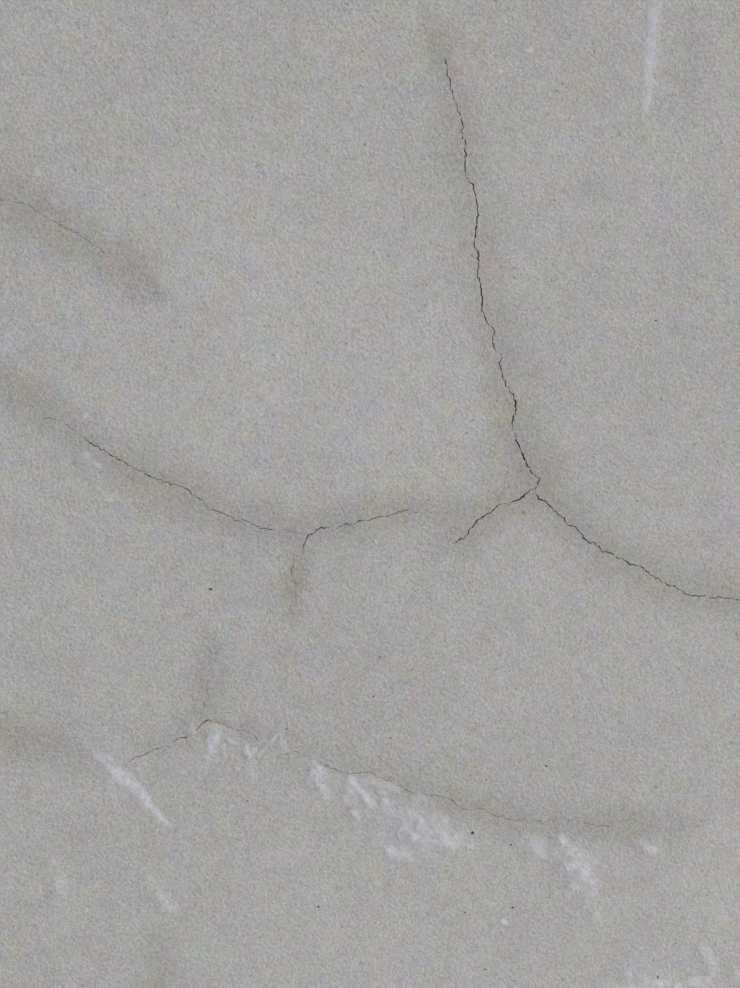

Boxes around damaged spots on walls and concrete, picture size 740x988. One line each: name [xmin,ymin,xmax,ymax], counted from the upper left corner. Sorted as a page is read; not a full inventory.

crack [0,199,106,256]
crack [444,57,740,601]
crack [39,417,422,599]
crack [131,682,635,827]